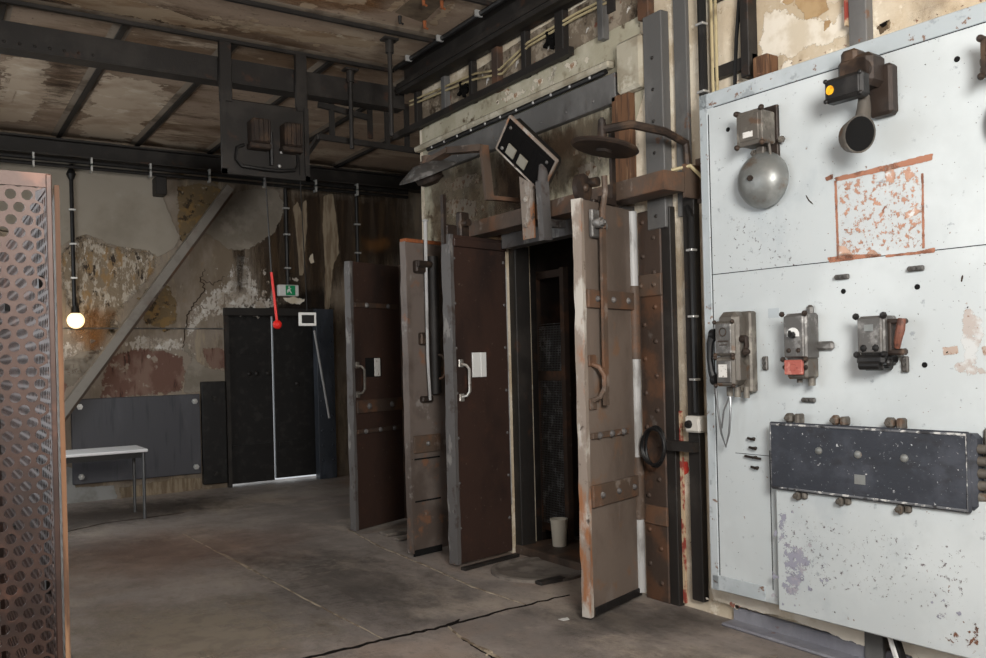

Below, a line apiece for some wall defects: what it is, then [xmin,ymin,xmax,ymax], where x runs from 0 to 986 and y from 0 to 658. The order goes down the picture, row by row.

peeling [736,0,891,83]
spalling [61,235,156,392]
flaking render [98,255,305,398]
crack [68,513,570,658]